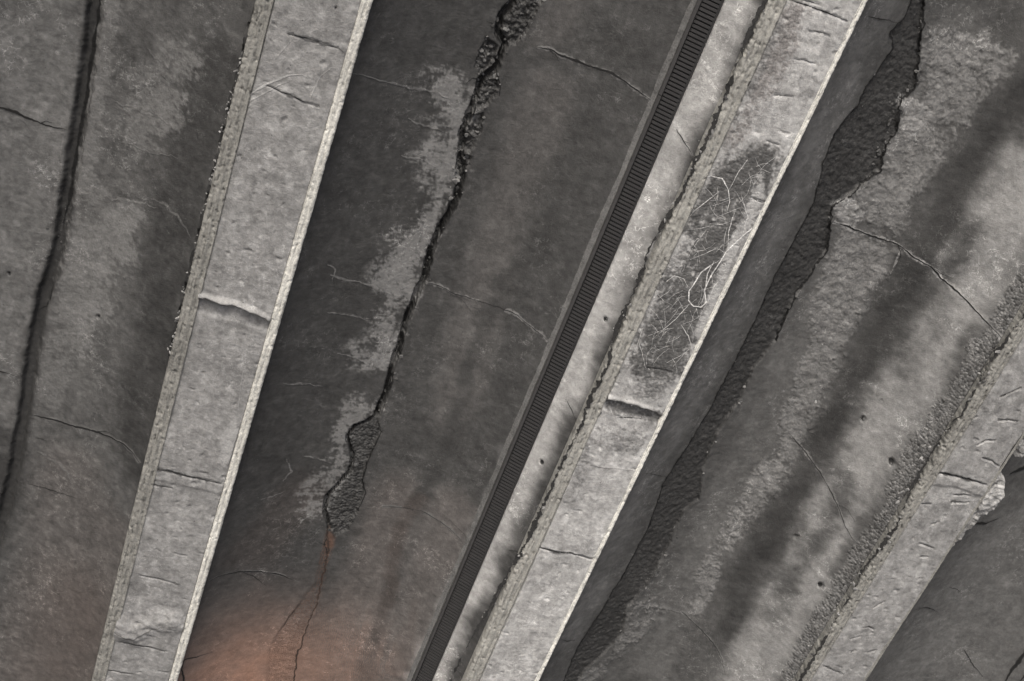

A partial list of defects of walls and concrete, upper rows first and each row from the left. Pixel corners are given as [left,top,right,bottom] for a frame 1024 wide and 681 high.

crack [0,0,221,488]
corrosion [178,521,434,681]
spalling [323,410,383,535]
water stain [261,49,493,681]
crack [318,0,550,561]
corrosion [435,646,460,681]
water stain [345,190,576,681]
spalling [454,0,546,182]
crack [449,0,847,681]
spalling [563,0,928,681]
water stain [571,13,1024,681]
crack [775,220,1024,681]